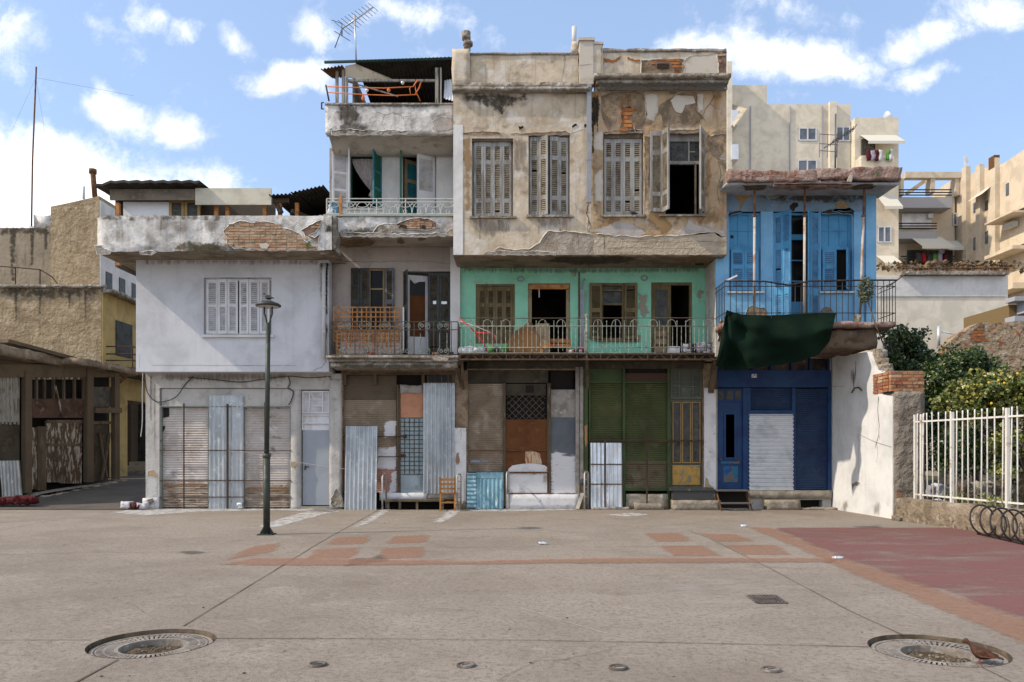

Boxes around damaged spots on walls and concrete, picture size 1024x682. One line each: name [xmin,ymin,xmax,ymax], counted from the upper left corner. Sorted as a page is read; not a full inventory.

peeling [603,52,727,73]
leakage [457,90,542,114]
flaking render [432,91,727,202]
flaking render [223,219,322,251]
spalling [340,217,453,248]
spalling [483,219,727,266]